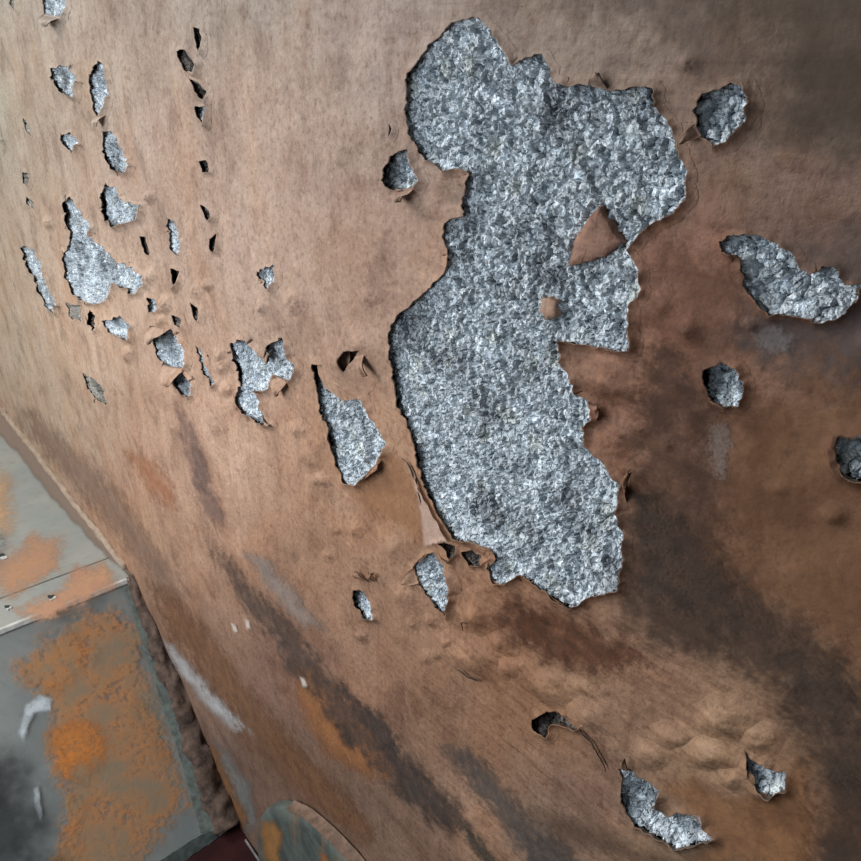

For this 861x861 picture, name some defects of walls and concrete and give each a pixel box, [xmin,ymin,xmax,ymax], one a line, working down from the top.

spalling [38,0,72,28]
spalling [15,54,222,404]
spalling [224,8,764,625]
spalling [711,224,861,332]
spalling [823,434,861,486]
leakage [166,643,251,733]
leakage [209,549,493,861]
spalling [524,705,587,744]
leakage [439,745,675,861]
spalling [610,759,717,855]
leakage [621,496,861,861]
spalling [735,742,798,803]